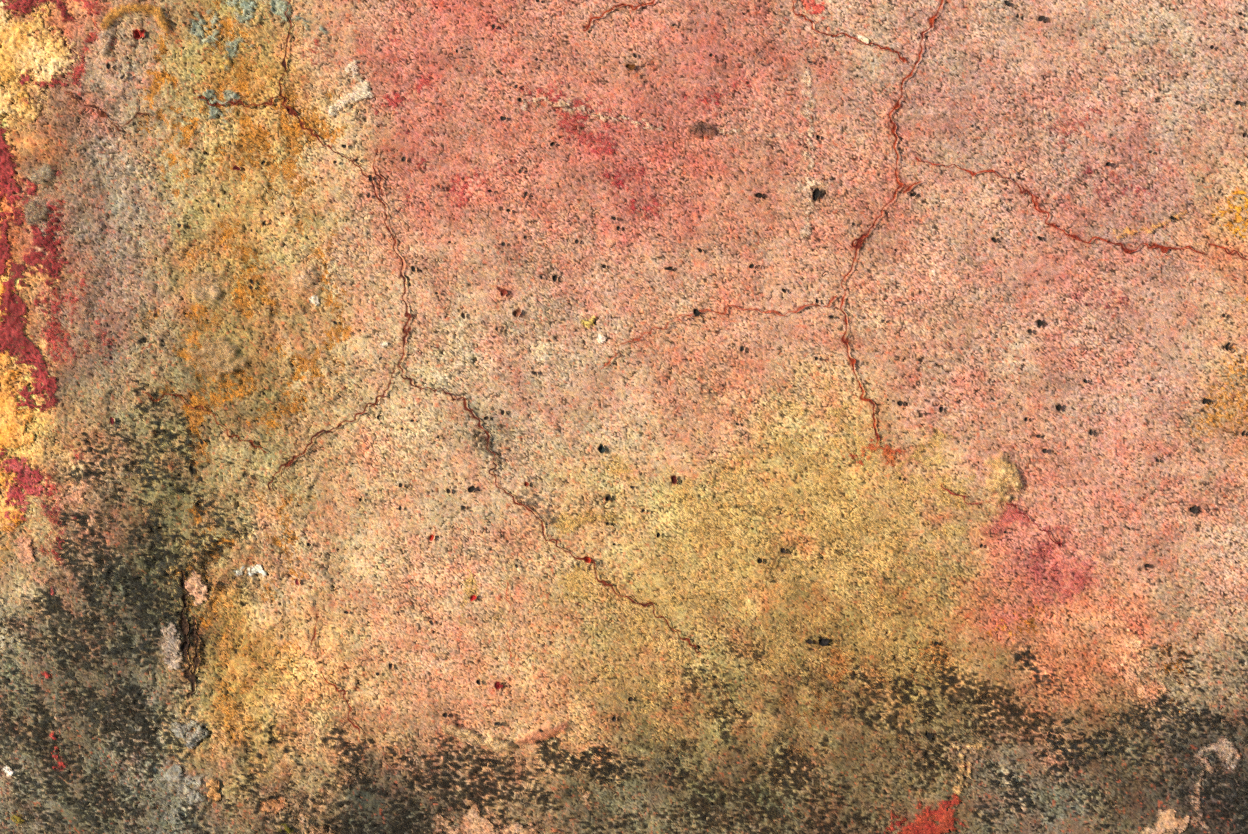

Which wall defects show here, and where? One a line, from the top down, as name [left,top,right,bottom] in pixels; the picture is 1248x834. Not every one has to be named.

crack [322,674,360,734]
crack [143,0,736,715]
water stain [0,375,1248,834]
crack [760,536,790,587]
crack [602,0,1248,446]
crack [941,484,1062,547]